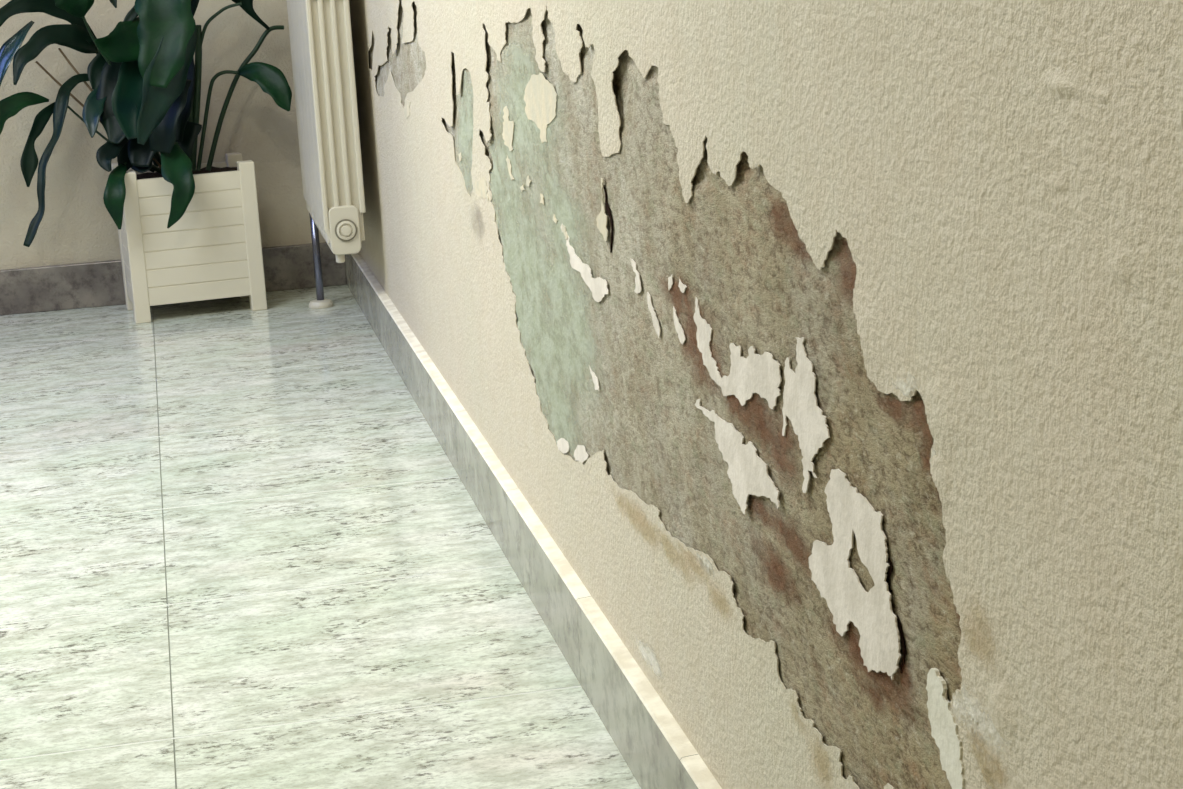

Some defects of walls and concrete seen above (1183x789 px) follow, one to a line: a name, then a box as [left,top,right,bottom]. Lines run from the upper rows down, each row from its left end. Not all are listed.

peeling [368,0,427,119]
peeling [442,8,965,789]